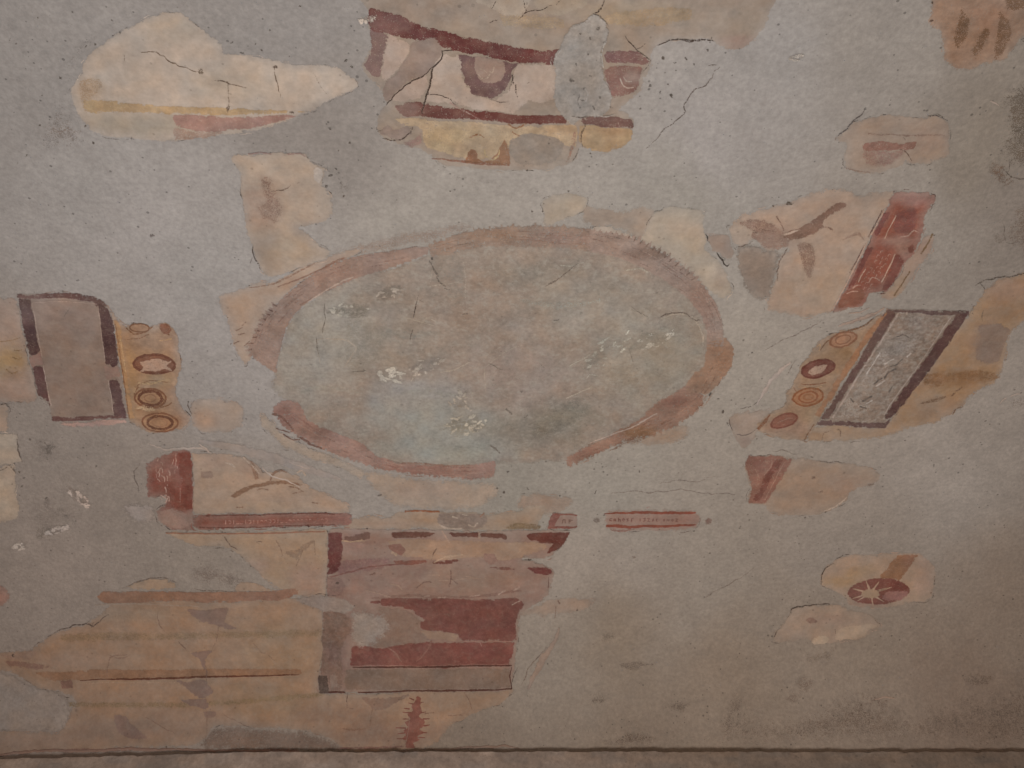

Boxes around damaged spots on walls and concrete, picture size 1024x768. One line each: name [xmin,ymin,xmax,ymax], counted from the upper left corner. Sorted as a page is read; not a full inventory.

crack [124,51,244,109]
crack [380,50,453,141]
crack [625,36,720,148]